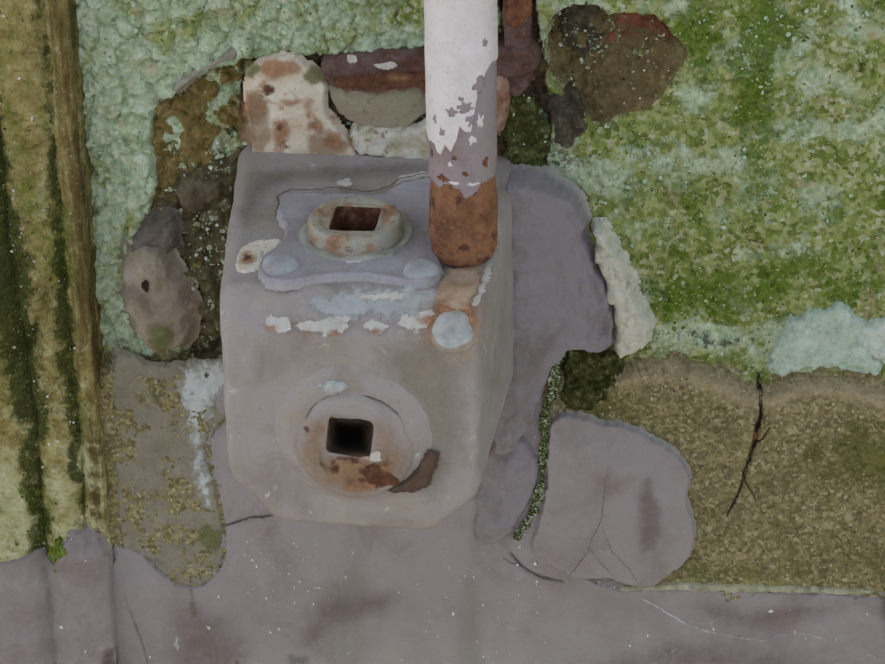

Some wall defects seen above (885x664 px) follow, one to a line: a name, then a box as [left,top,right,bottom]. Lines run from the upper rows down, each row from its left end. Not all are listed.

corrosion [523,0,551,124]
corrosion [241,53,425,155]
corrosion [482,136,508,167]
peeling [235,238,281,273]
peeling [111,46,250,586]
peeling [265,286,440,337]
crack [727,373,770,515]
corrosion [329,451,400,490]
crack [643,599,726,634]